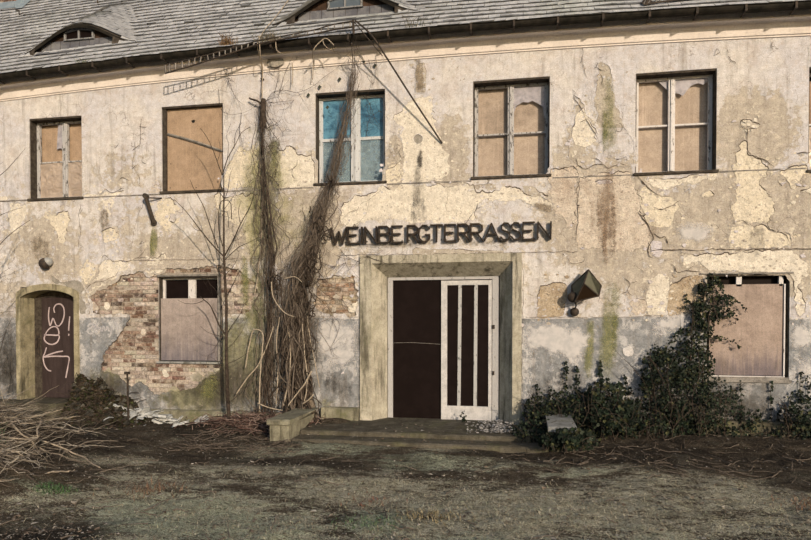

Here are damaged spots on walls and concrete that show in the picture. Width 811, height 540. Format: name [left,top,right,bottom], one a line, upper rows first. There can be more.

peeling [0,195,33,237]
peeling [42,207,73,248]
crack [497,48,624,280]
peeling [334,56,811,329]
crack [622,179,811,295]
spalling [52,139,318,400]
spalling [309,266,360,324]
leakage [522,323,589,363]
leakage [654,314,697,335]
leakage [792,323,811,348]